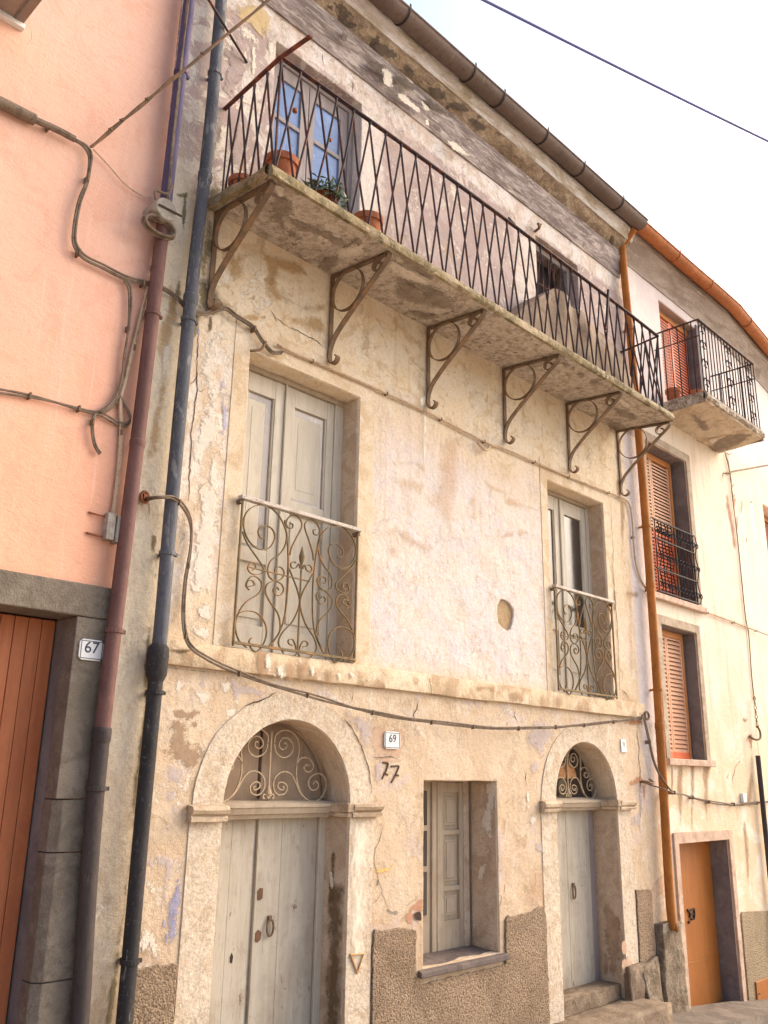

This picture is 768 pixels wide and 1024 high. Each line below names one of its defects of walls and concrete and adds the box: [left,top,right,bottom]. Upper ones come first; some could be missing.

spalling [367,43,486,131]
flaking render [447,140,470,156]
crack [188,334,205,499]
flaking render [191,326,227,639]
spalling [162,679,210,814]
peeling [139,855,181,958]
damp [326,824,365,1024]